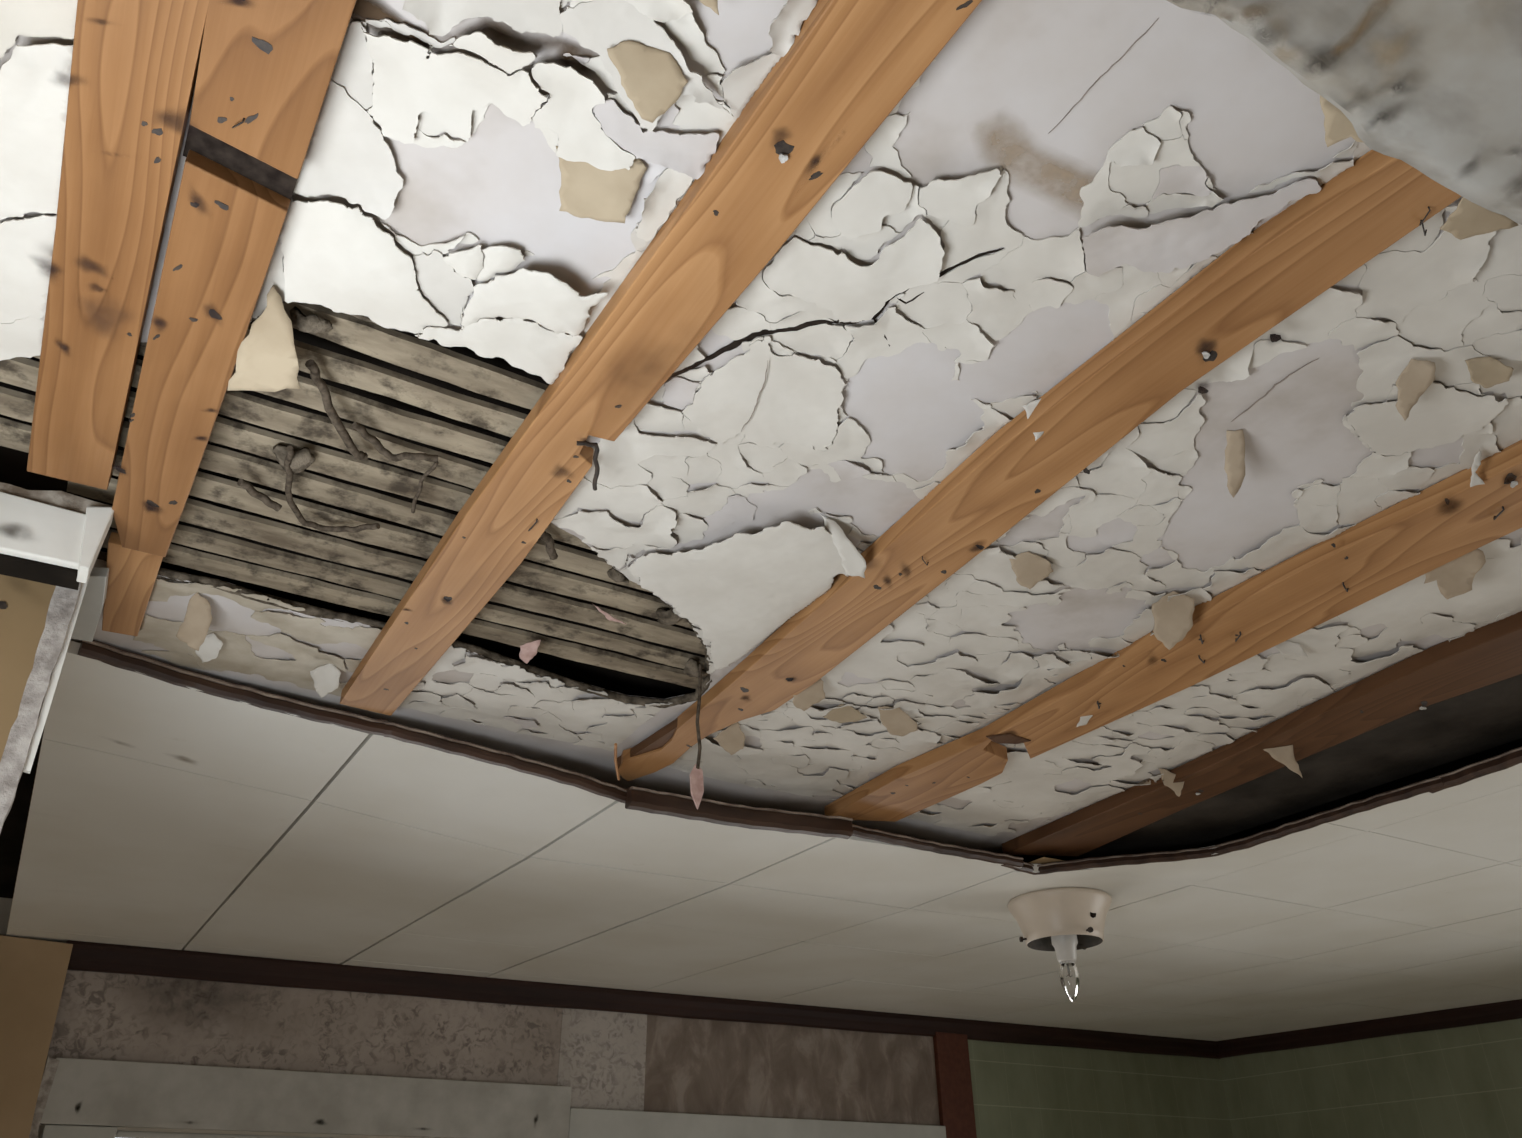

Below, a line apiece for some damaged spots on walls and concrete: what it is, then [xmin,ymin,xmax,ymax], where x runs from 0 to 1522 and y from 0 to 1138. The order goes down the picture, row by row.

peeling [0,0,78,361]
peeling [227,0,818,392]
crack [665,248,1004,431]
peeling [399,59,1372,751]
water stain [988,132,1091,205]
peeling [668,205,1522,836]
water stain [1306,0,1388,72]